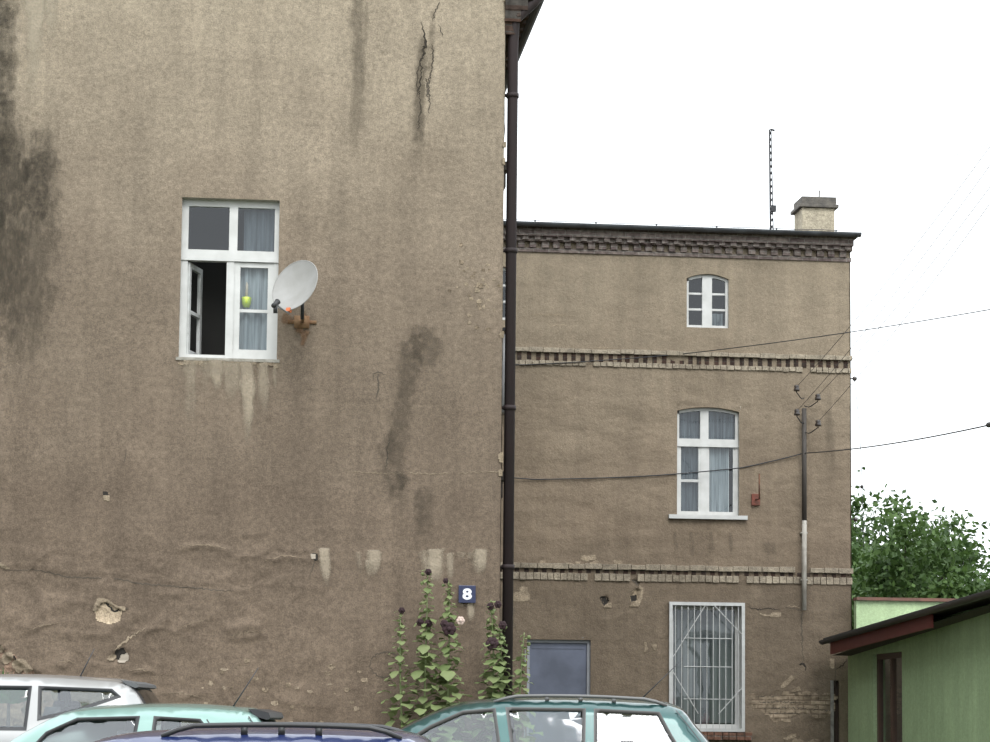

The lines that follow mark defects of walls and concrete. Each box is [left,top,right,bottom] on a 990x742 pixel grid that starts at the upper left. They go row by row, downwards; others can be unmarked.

crack [416,2,443,129]
spalling [629,579,643,607]
spalling [93,598,128,624]
spalling [0,645,35,674]
spalling [107,628,145,663]
spalling [0,696,27,726]
spalling [41,691,54,713]
peeling [750,675,838,722]